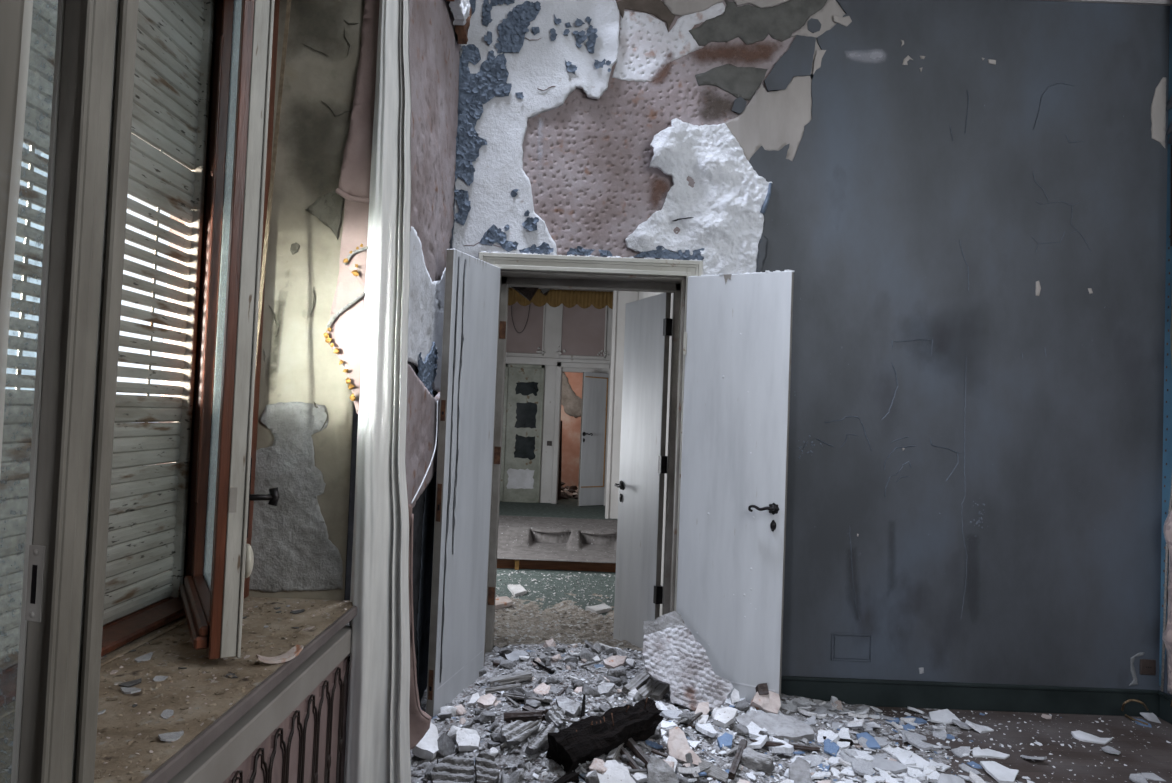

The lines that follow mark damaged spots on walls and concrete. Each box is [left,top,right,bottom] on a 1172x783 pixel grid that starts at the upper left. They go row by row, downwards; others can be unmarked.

spalling [405,0,852,703]
peeling [1151,77,1166,148]